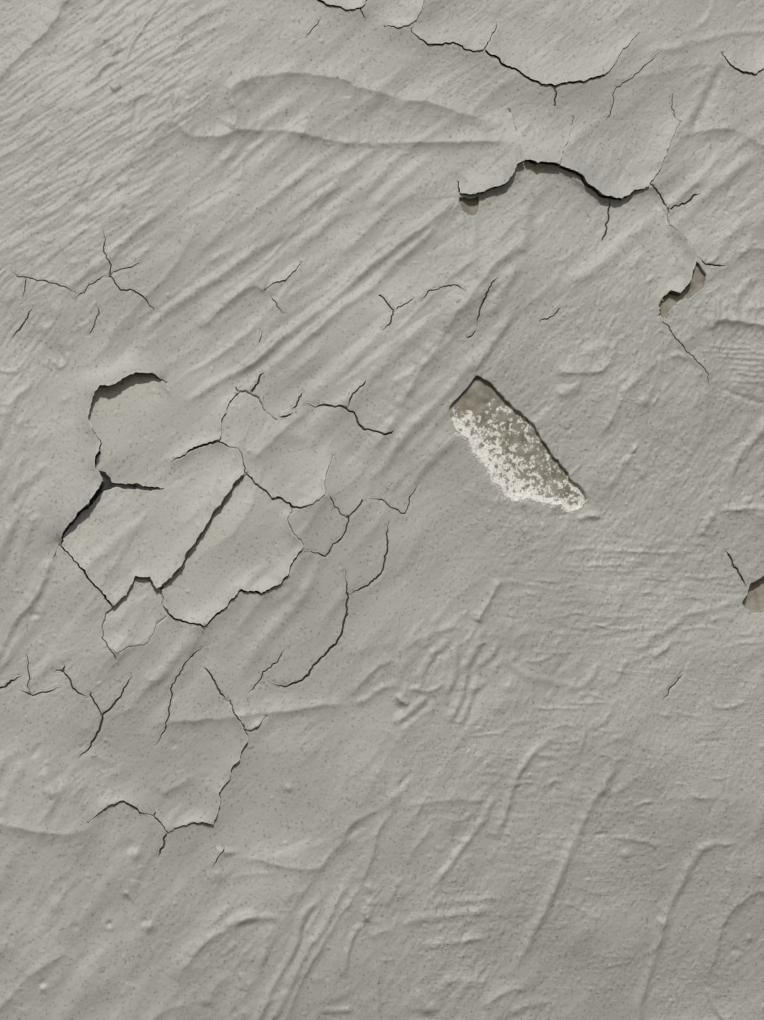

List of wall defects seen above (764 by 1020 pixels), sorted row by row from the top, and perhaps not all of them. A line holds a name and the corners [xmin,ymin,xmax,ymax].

peeling [315,0,370,19]
peeling [380,0,726,387]
crack [10,226,156,340]
crack [270,296,285,315]
crack [352,270,500,340]
peeling [5,329,335,661]
crack [279,377,410,452]
peeling [445,373,590,514]
crack [152,480,420,746]
peeling [740,574,764,615]
crack [0,652,134,760]
peeling [82,700,267,858]